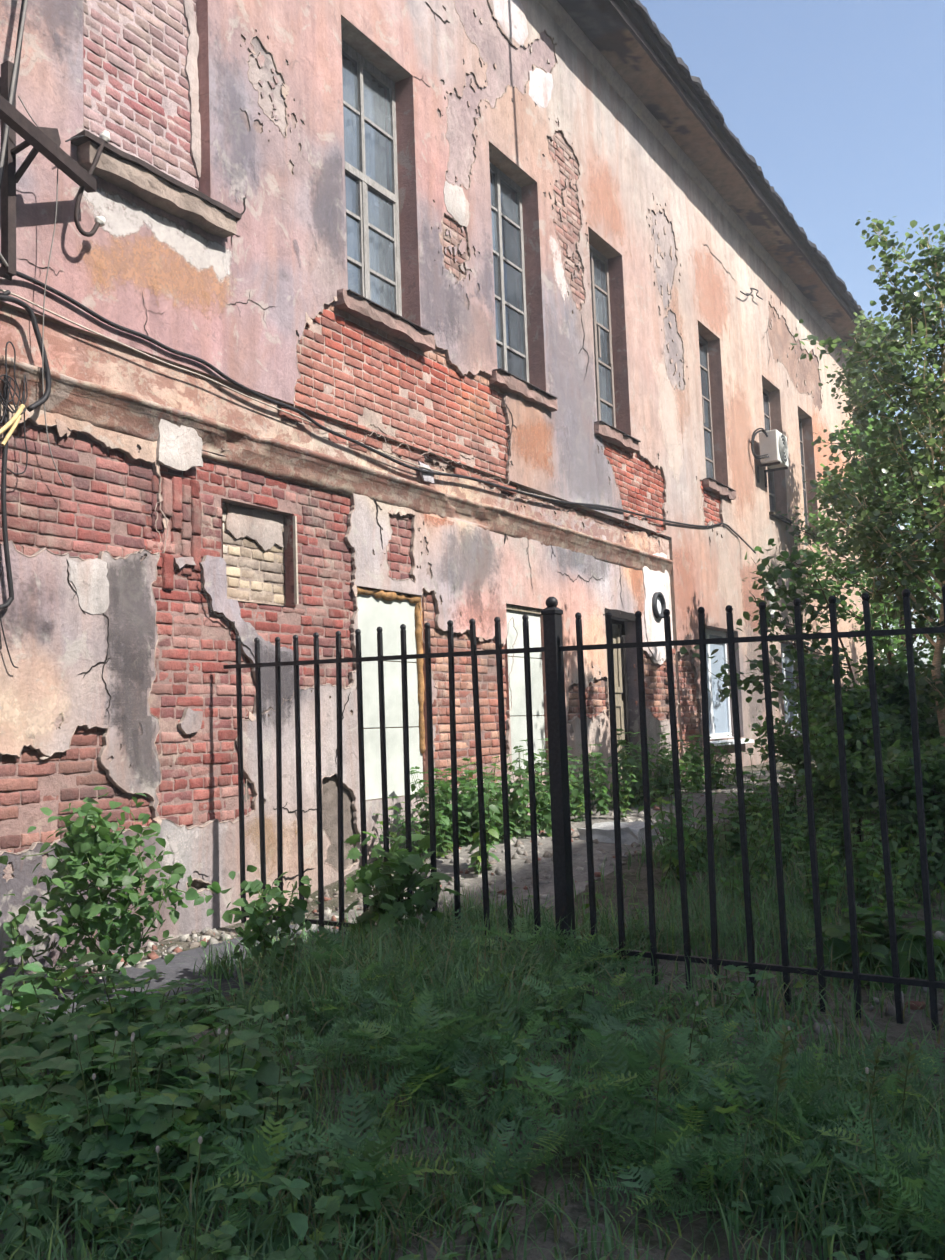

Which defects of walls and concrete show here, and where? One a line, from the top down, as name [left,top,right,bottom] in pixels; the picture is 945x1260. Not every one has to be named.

peeling [83,189,231,281]
flaking render [437,0,558,310]
flaking render [542,123,587,314]
flaking render [276,296,667,544]
water stain [105,559,160,783]
flaking render [0,416,363,881]
flaking render [372,508,518,788]